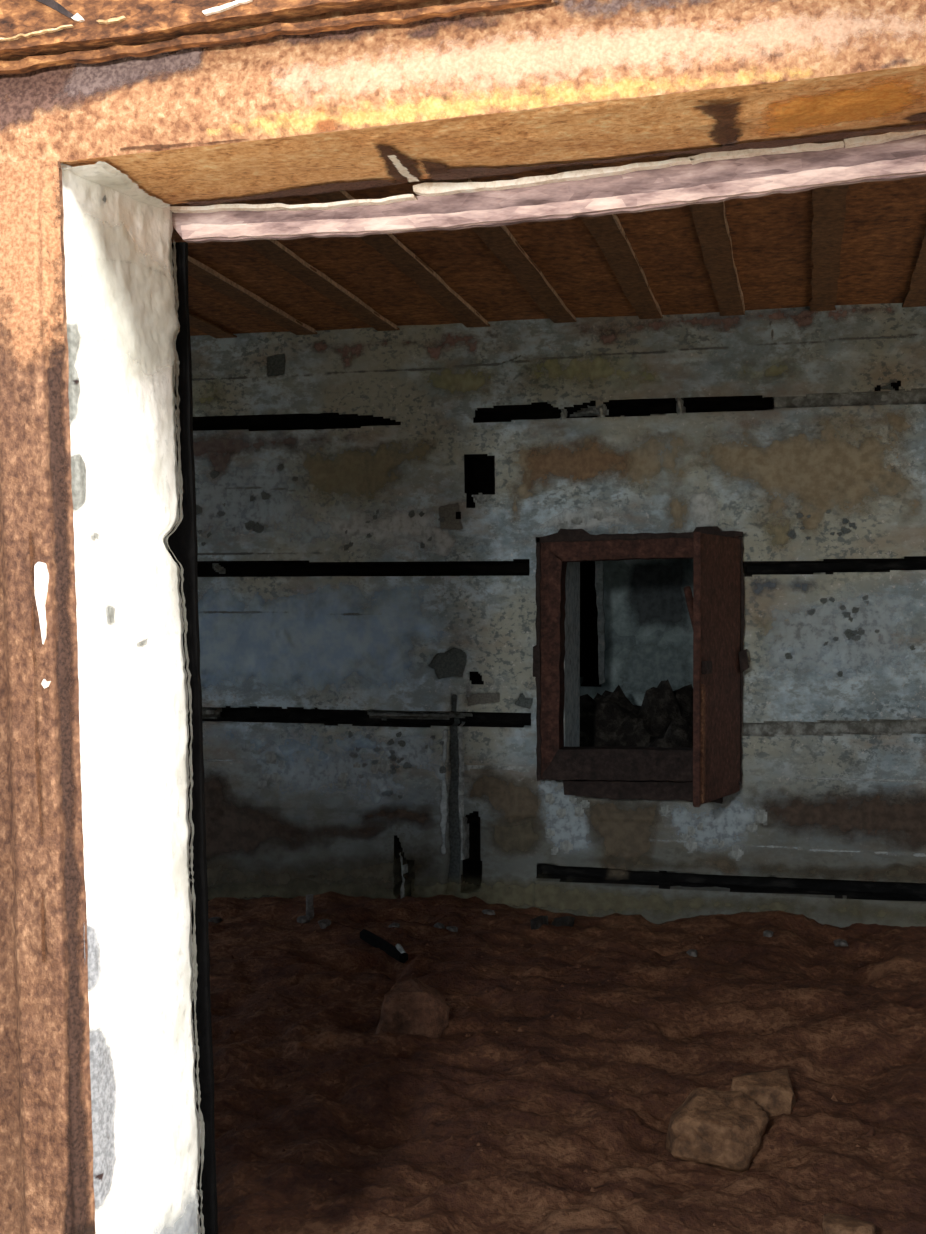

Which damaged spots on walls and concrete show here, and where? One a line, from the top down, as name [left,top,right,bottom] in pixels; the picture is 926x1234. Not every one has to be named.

leakage [193,437,430,499]
spalling [107,605,115,624]
leakage [205,767,812,917]
leakage [762,792,926,850]
leakage [758,864,926,884]